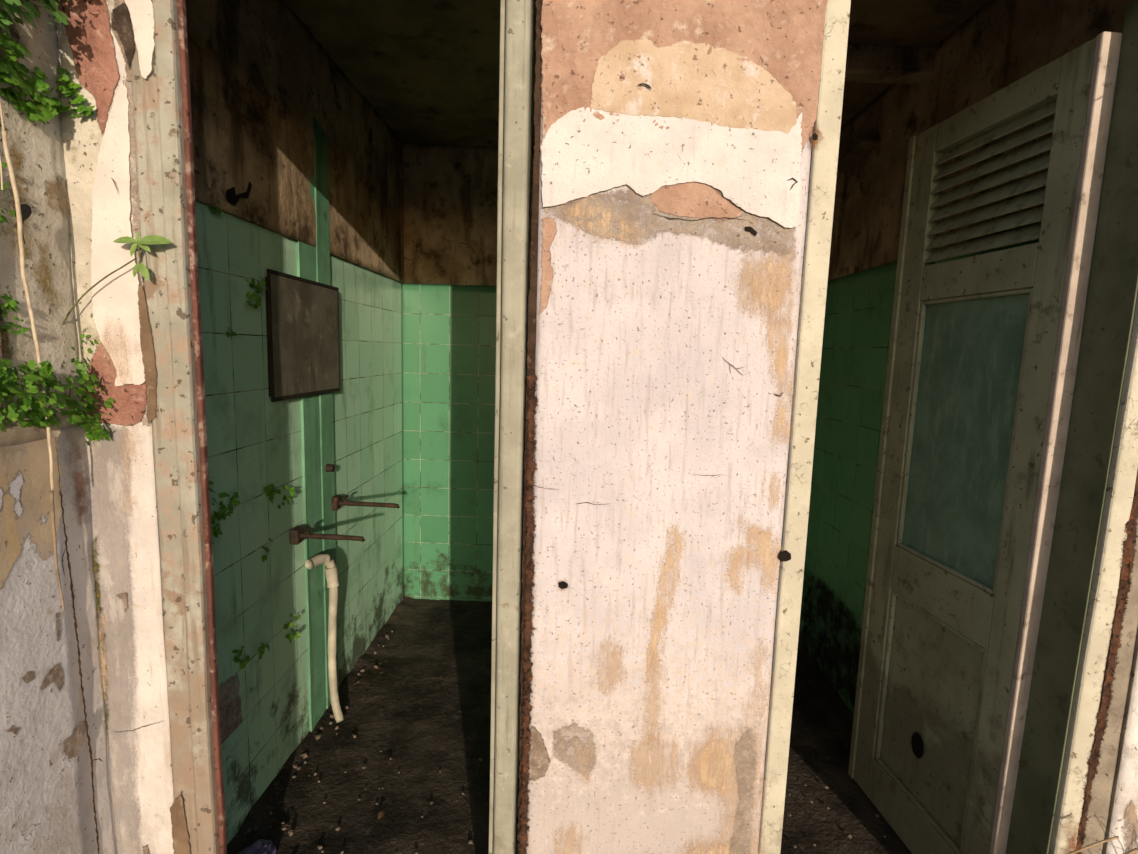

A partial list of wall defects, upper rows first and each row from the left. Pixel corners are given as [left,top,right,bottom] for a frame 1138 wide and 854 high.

peeling [56,0,157,426]
flaking render [540,0,828,442]
peeling [0,437,65,590]
peeling [22,663,64,692]
peeling [64,720,86,759]
crack [55,437,102,854]
corrosion [518,371,538,854]
corrosion [1069,469,1138,854]